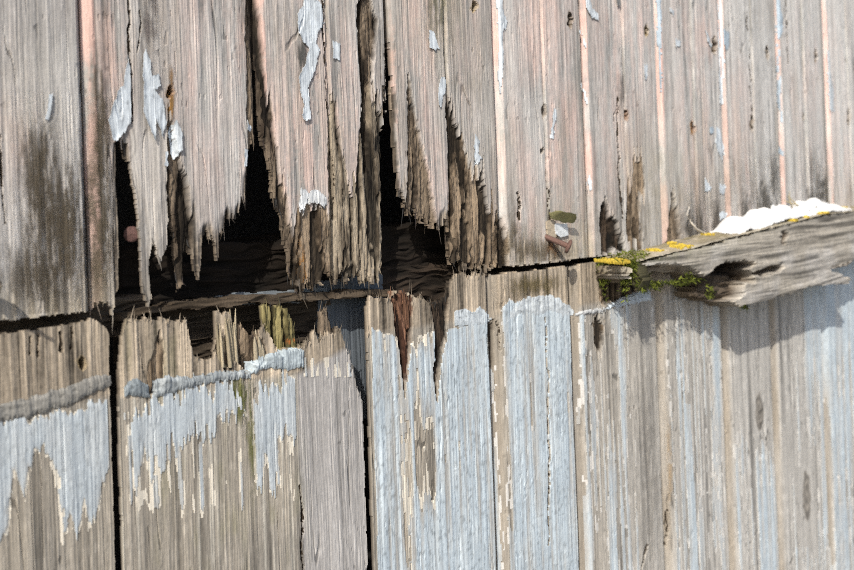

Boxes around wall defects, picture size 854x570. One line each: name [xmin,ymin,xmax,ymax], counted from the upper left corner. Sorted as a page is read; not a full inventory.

water stain [95,74,108,174]
peeling [108,55,132,141]
peeling [142,49,183,166]
peeling [297,0,325,121]
peeling [429,30,440,51]
peeling [655,0,674,92]
peeling [705,0,730,104]
water stain [14,128,108,302]
peeling [298,187,327,212]
peeling [0,374,112,546]
peeling [124,347,352,518]
peeling [371,290,653,570]